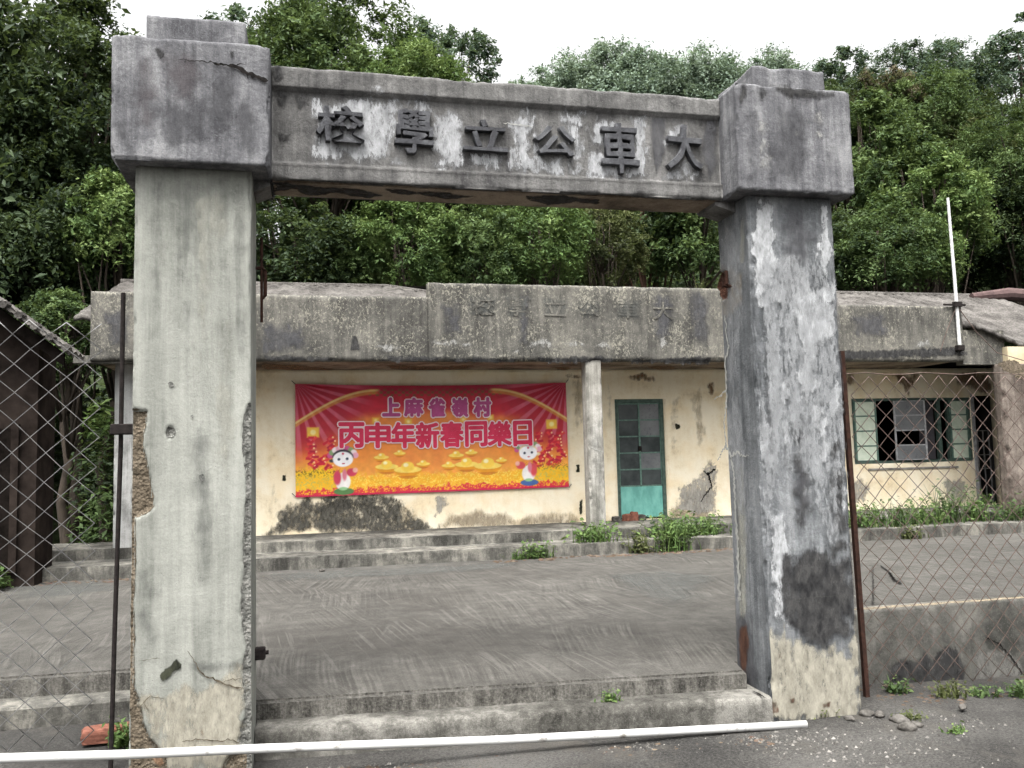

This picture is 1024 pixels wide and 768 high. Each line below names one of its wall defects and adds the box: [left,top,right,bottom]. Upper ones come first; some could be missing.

crack [178,59,268,82]
peeling [312,86,649,180]
peeling [663,121,680,146]
peeling [662,160,699,181]
crack [701,316,749,601]
peeling [717,199,861,720]
water stain [944,480,966,503]
mould [266,494,429,535]
water stain [781,424,869,649]
peeling [129,403,251,768]
crack [189,653,242,689]